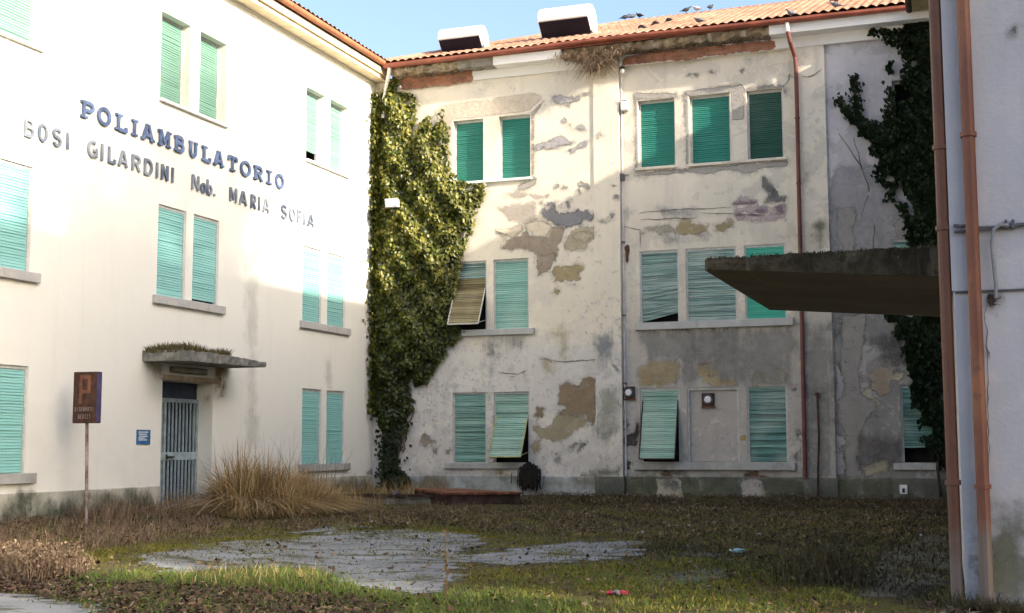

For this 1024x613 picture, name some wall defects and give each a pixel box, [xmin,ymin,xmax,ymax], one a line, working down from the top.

peeling [535,92,601,153]
peeling [675,177,786,236]
flaking render [502,181,614,295]
flaking render [531,377,596,461]
flaking render [637,359,681,388]
flaking render [833,314,889,478]
flaking render [655,471,684,498]
flaking render [738,471,766,498]